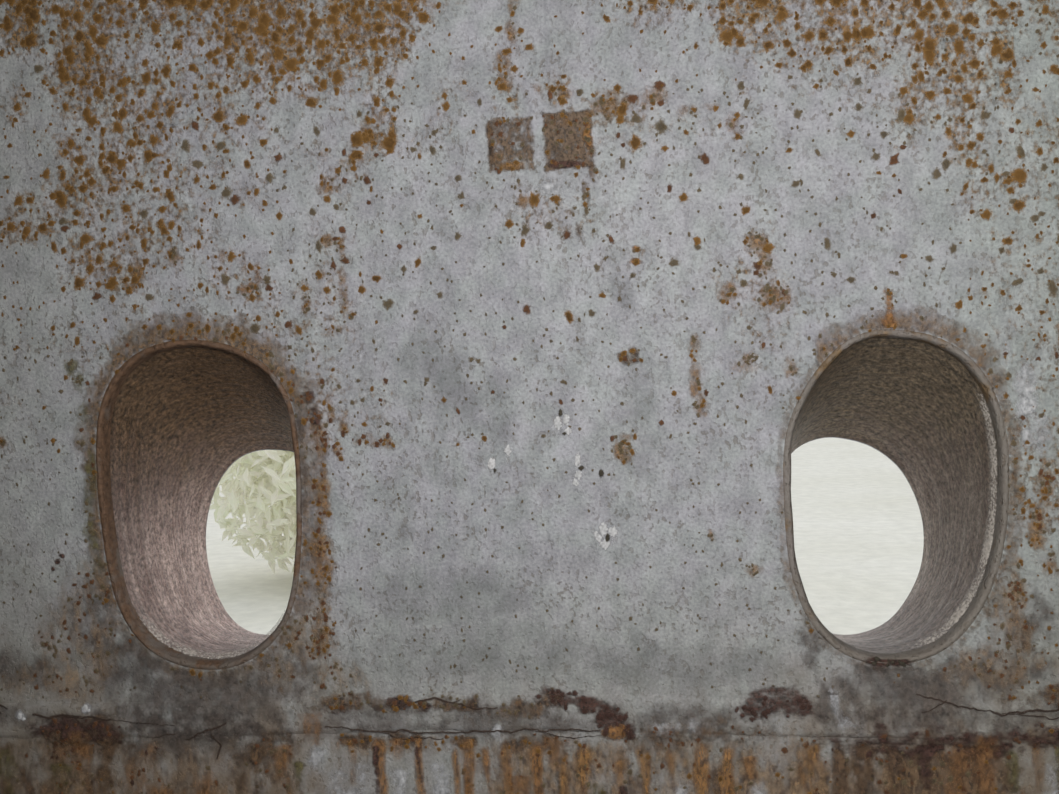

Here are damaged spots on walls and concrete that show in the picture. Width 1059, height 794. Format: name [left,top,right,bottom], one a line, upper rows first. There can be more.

rust [601,0,1059,377]
crack [32,713,226,759]
crack [325,697,600,740]
crack [916,694,1059,720]